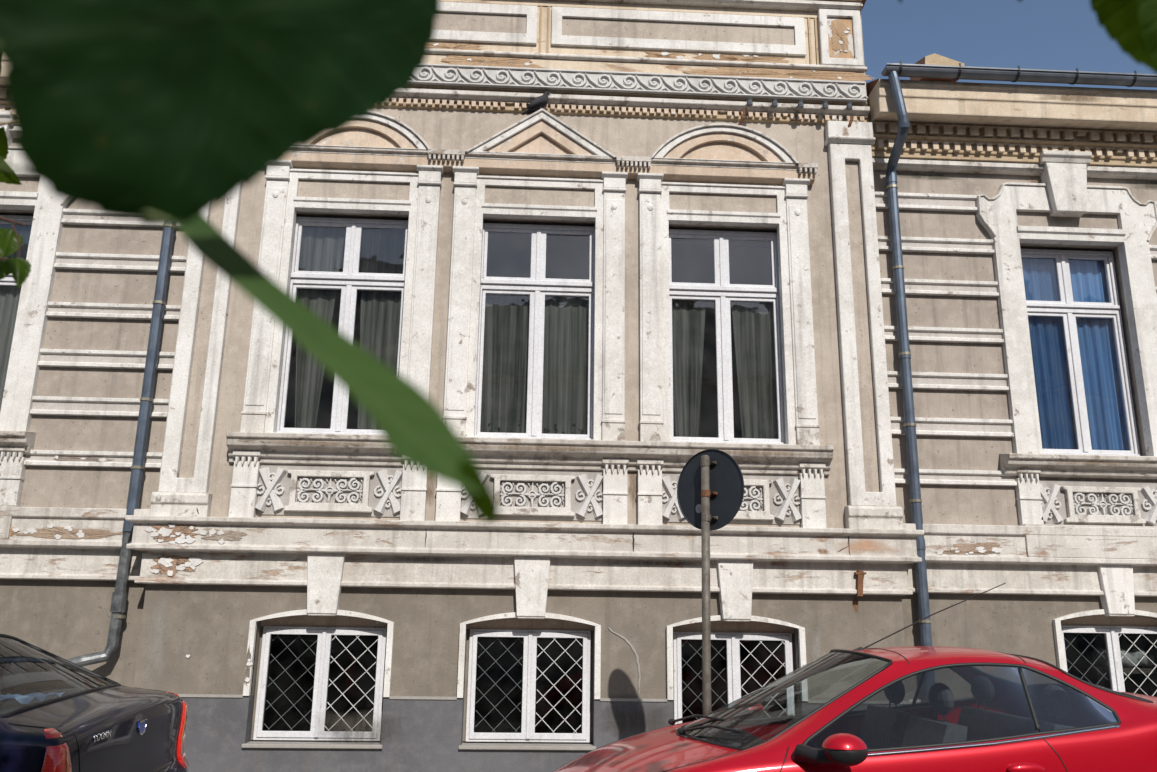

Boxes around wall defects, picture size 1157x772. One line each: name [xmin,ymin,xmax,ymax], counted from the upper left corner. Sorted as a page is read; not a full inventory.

flaking render [831,19,850,53]
peeling [9,524,123,539]
spalling [145,524,247,577]
peeling [936,542,1002,555]